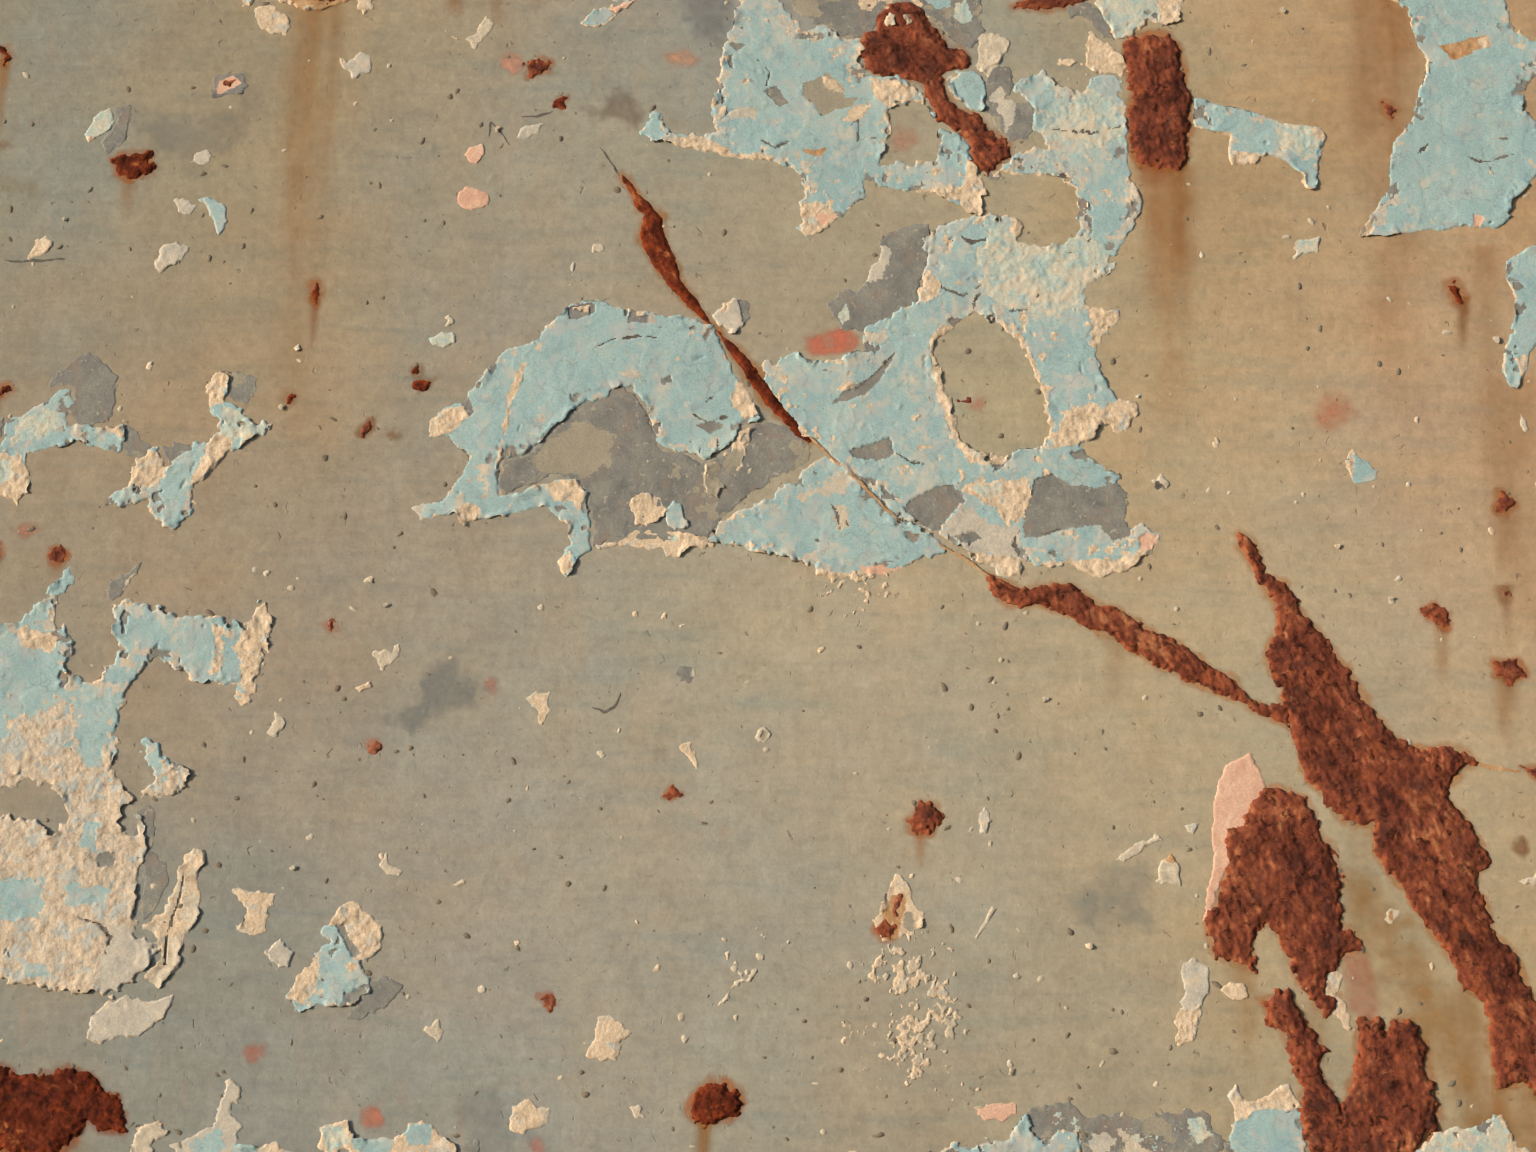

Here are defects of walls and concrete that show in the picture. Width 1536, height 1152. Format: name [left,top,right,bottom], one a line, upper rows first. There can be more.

corrosion [860,1,1011,177]
corrosion [1122,31,1193,182]
peeling [1358,0,1536,237]
crack [599,147,900,521]
peeling [412,0,1184,583]
peeling [0,371,273,530]
crack [592,692,621,714]
corrosion [1492,658,1528,687]
peeling [0,566,272,1044]
corrosion [1204,785,1440,1152]
corrosion [686,1078,745,1152]
peeling [1416,1114,1530,1152]